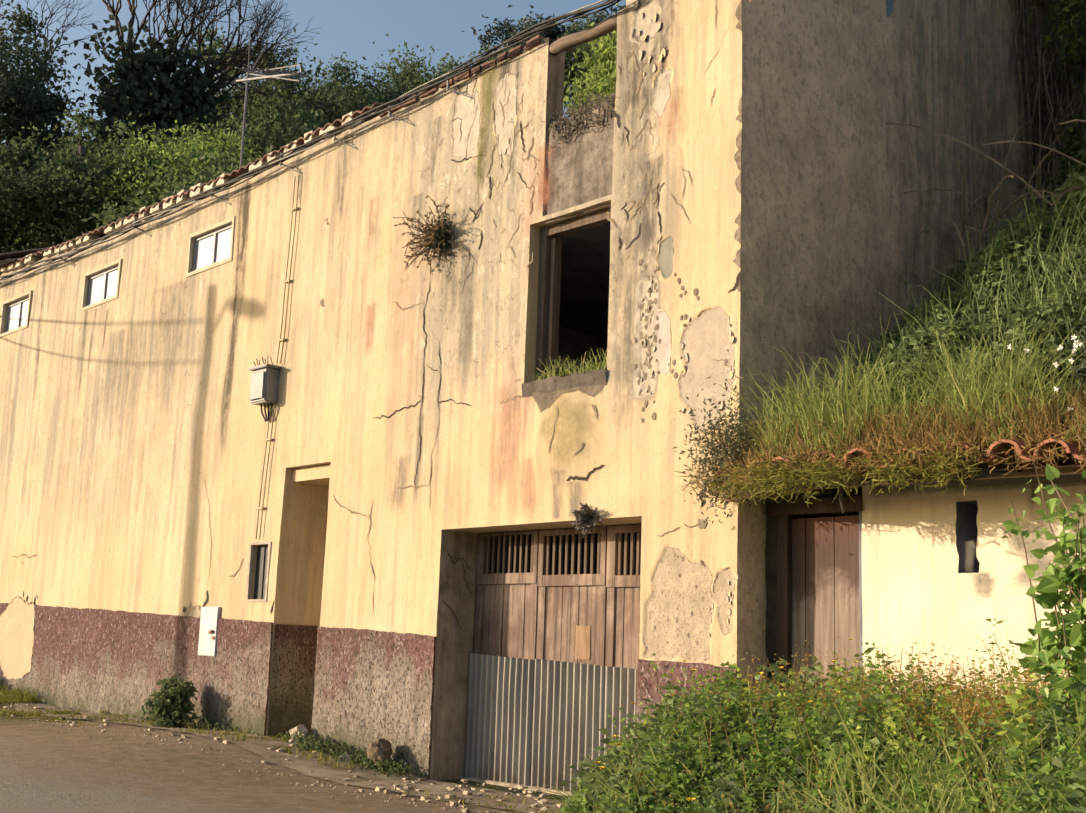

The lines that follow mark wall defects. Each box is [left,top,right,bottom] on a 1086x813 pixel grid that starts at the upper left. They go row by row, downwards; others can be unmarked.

crack [451,117,483,162]
leakage [482,63,518,118]
peeling [607,0,675,250]
spalling [734,95,742,194]
leakage [221,185,249,427]
spalling [632,235,738,436]
crack [373,283,472,509]
crack [566,462,605,482]
spalling [0,593,37,680]
crack [334,496,375,614]
spalling [640,547,738,663]
leakage [1012,535,1065,580]